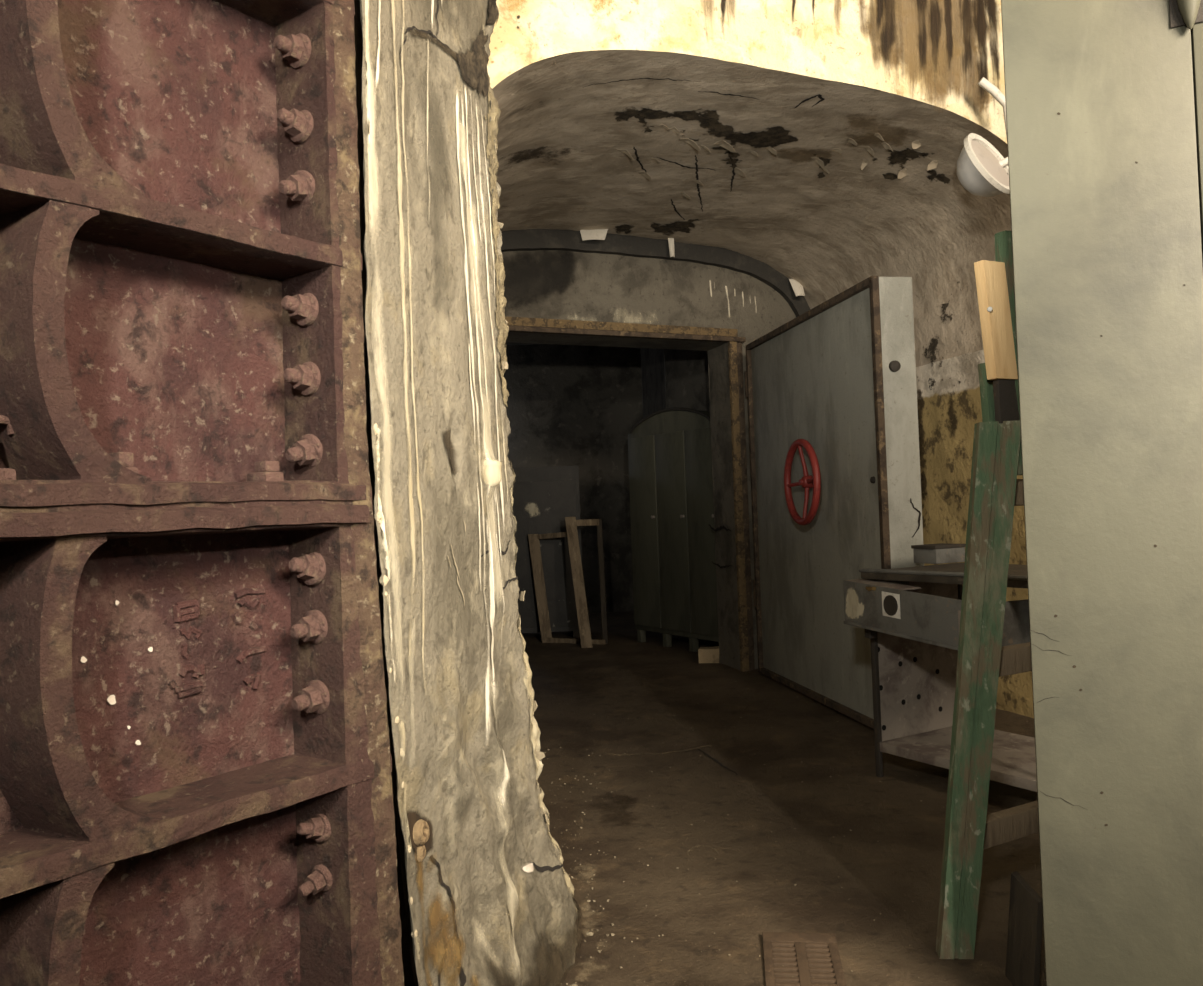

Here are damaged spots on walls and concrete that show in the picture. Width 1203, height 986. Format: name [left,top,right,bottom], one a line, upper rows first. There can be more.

water stain [860,0,1000,111]
peeling [614,107,798,220]
peeling [811,133,950,183]
water stain [365,0,424,576]
peeling [580,229,608,241]
water stain [374,307,403,679]
water stain [427,89,510,801]
water stain [395,716,405,757]
rust [407,811,478,986]
crack [430,855,466,986]